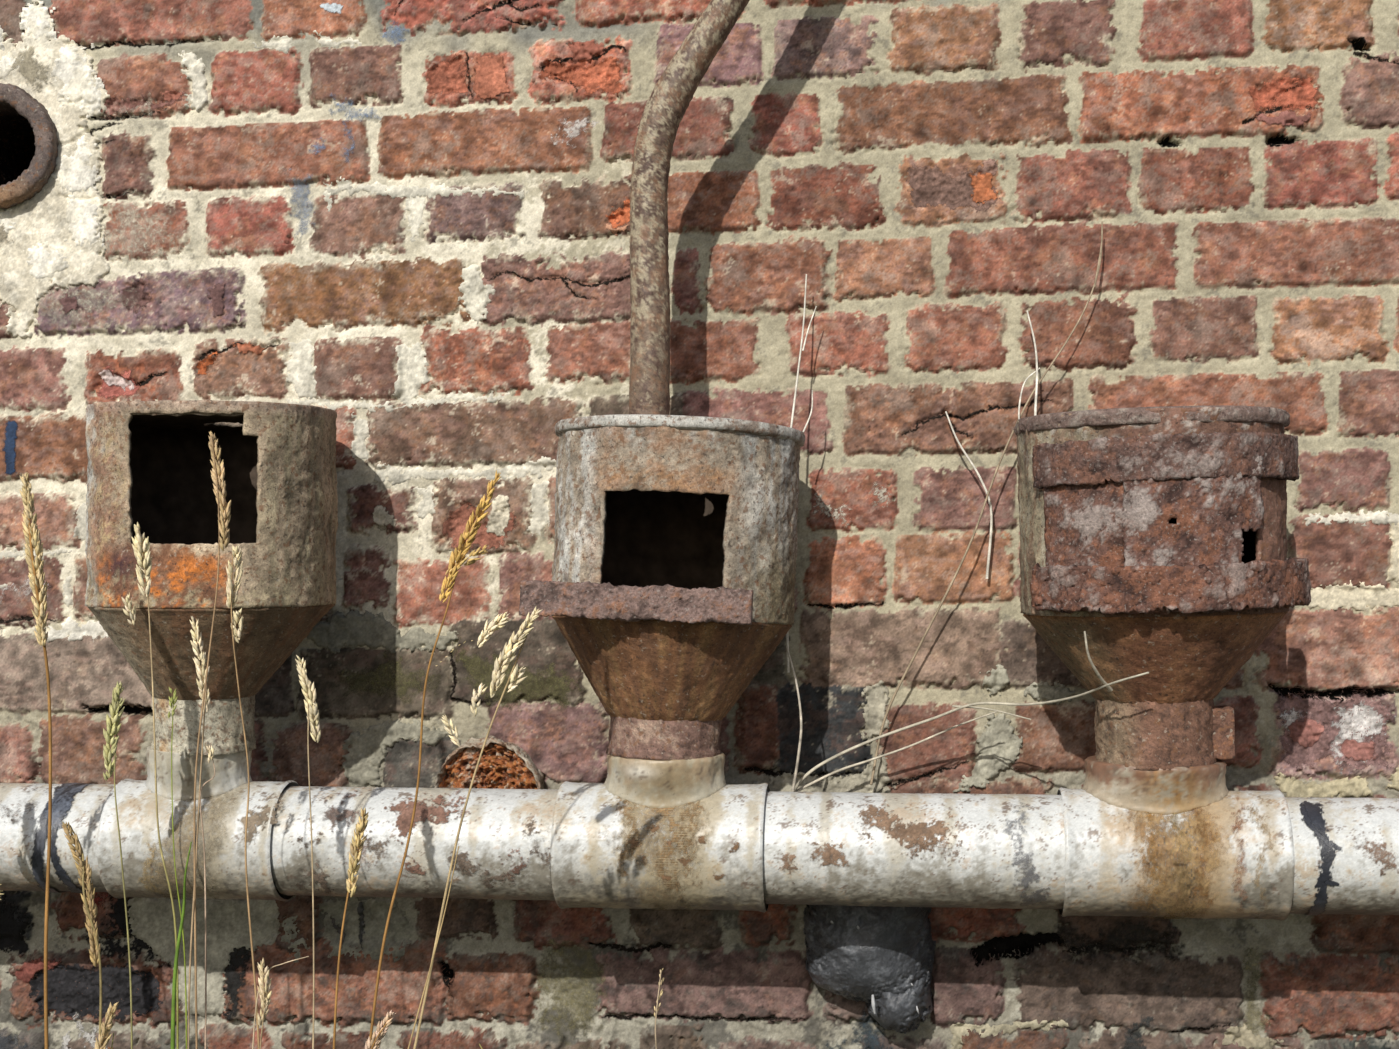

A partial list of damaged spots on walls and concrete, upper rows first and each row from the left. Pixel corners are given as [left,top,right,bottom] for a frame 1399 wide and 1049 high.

crack [463,0,539,99]
spalling [538,39,624,98]
crack [1353,52,1399,64]
crack [1242,86,1318,124]
peeling [0,0,185,338]
spalling [207,283,225,317]
crack [489,270,631,299]
crack [198,342,280,361]
crack [134,371,167,387]
leakage [1280,708,1307,731]
leakage [1331,703,1396,774]